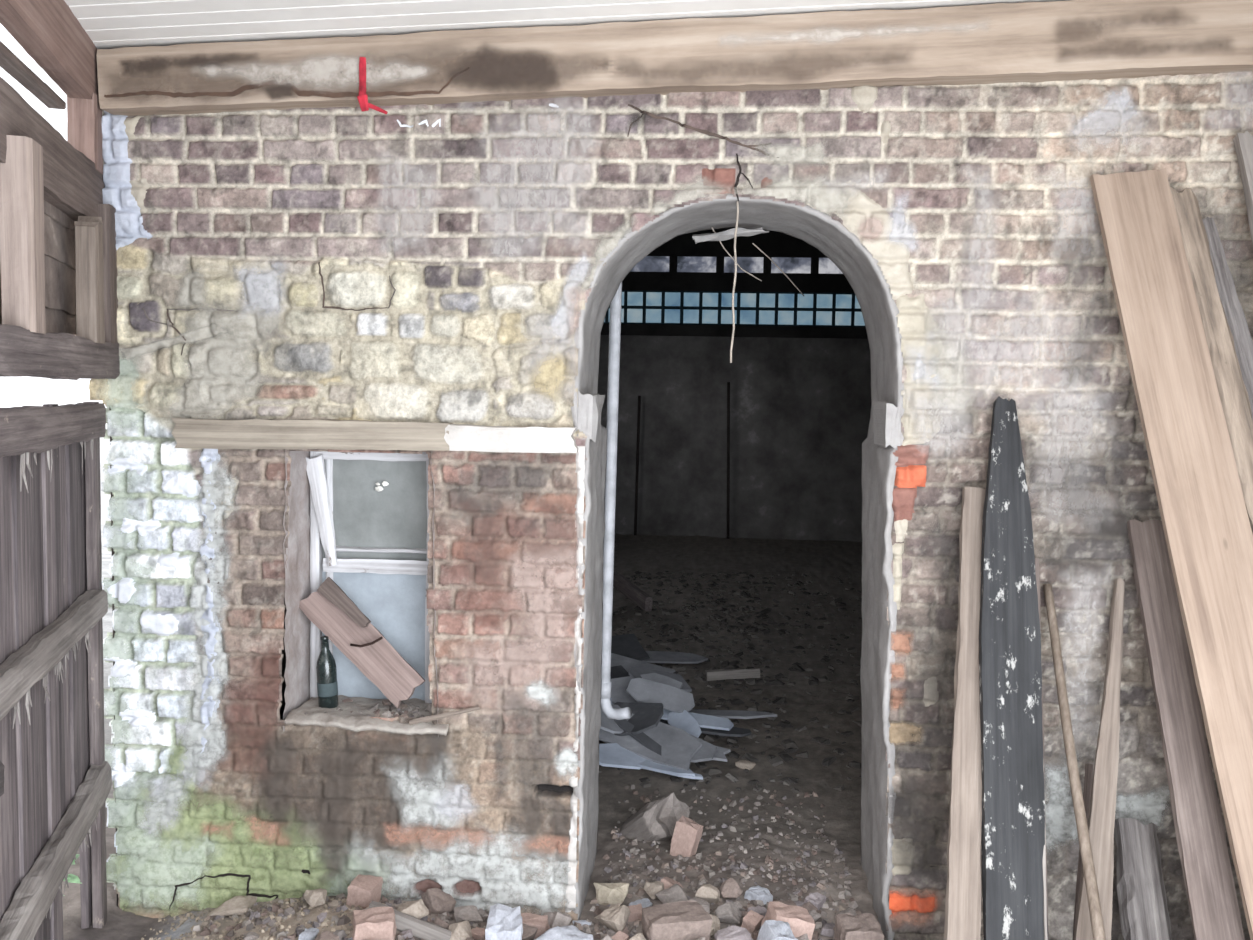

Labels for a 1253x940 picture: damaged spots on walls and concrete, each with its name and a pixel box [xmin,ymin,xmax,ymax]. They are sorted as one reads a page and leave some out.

damp [104,48,605,101]
damp [619,56,853,82]
crack [628,104,779,201]
crack [318,262,396,311]
spalling [892,445,930,610]
damp [528,681,553,703]
spalling [889,633,922,743]
peeling [923,676,939,707]
damp [557,749,578,775]
damp [246,734,571,913]
peeling [891,838,916,876]
crack [169,873,278,909]